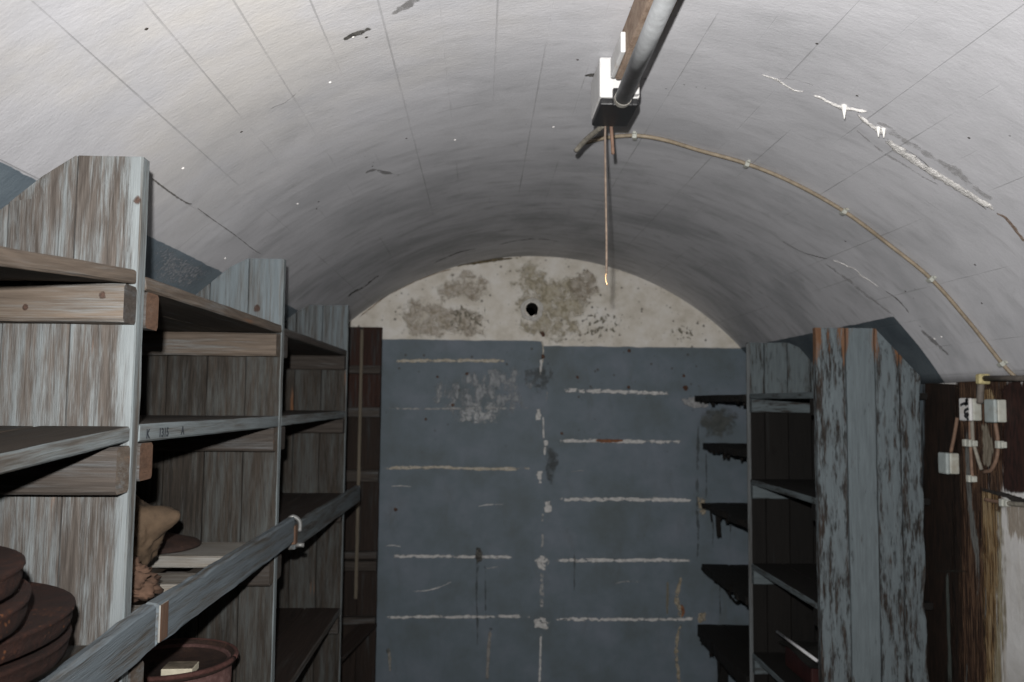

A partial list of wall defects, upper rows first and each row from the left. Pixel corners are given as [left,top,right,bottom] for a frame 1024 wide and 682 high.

crack [762,74,1024,241]
crack [153,179,259,253]
leakage [361,249,622,342]